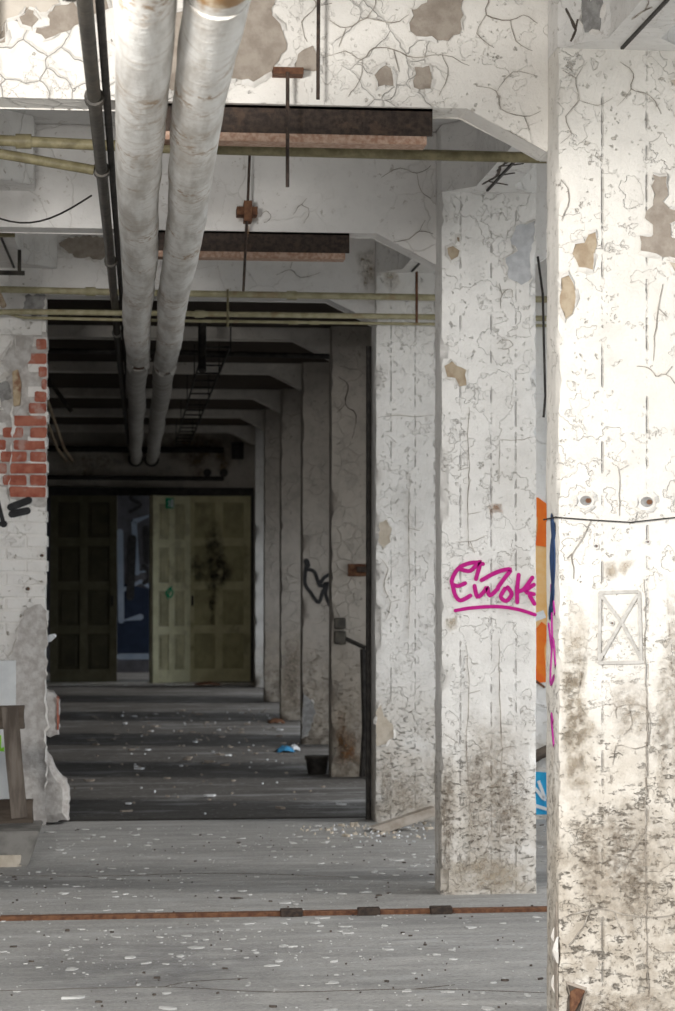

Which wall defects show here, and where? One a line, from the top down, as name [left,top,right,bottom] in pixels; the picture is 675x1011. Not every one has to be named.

peeling [0,0,79,45]
peeling [230,0,287,88]
peeling [290,46,324,74]
crack [301,0,540,130]
peeling [406,0,466,44]
crack [565,8,579,42]
crack [561,62,661,143]
peeling [503,219,536,285]
peeling [557,229,598,323]
peeling [638,172,675,275]
crack [638,284,675,384]
spalling [0,332,48,507]